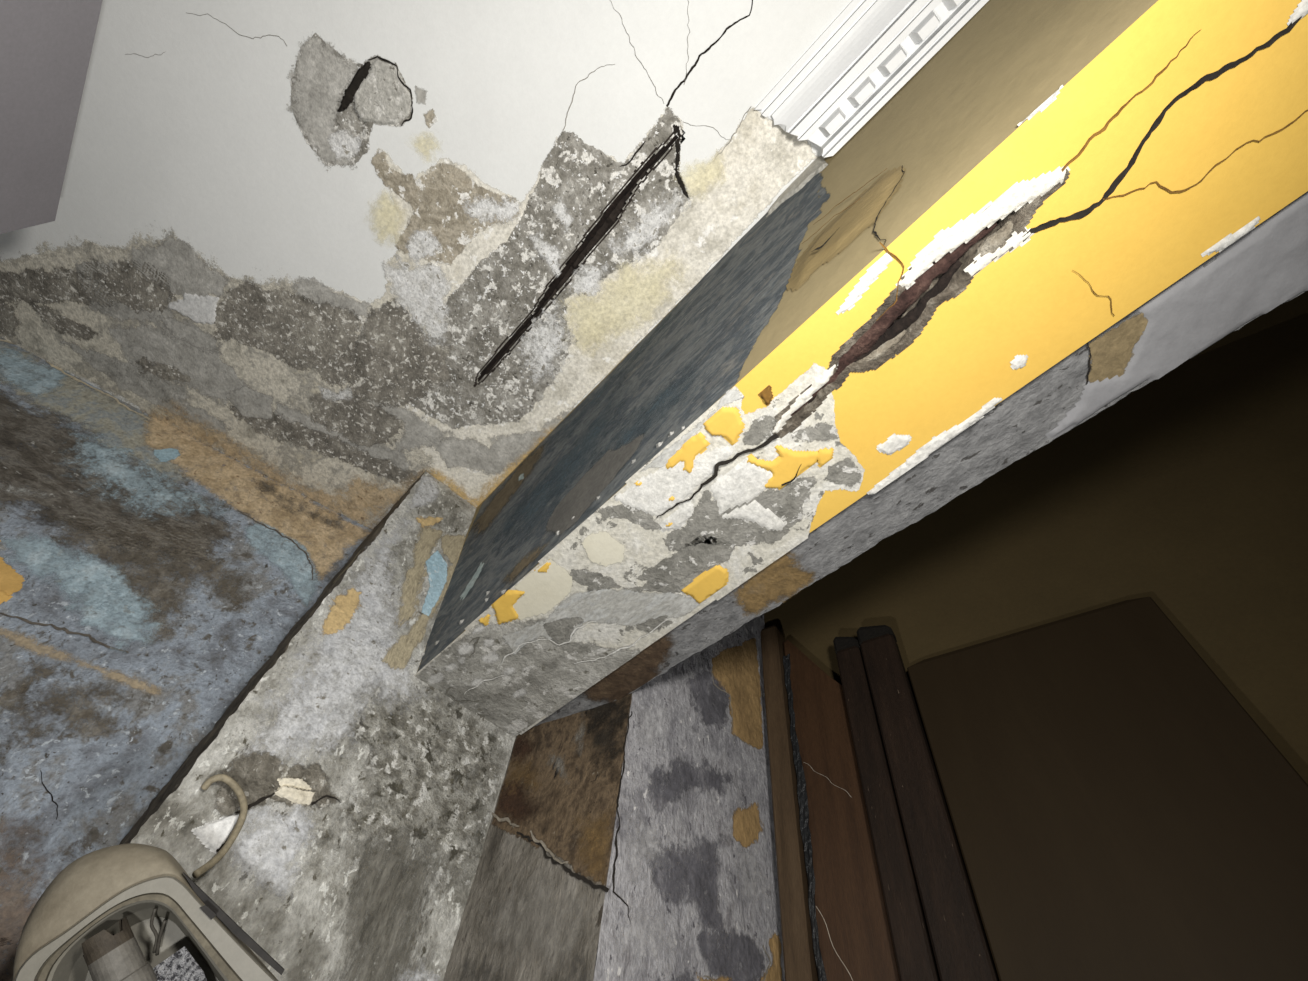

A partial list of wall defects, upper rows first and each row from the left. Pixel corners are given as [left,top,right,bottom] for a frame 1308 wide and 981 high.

crack [563,0,753,178]
crack [1022,0,1308,242]
crack [872,165,905,321]
crack [1072,270,1115,316]
peeling [0,33,1070,749]
water stain [0,390,552,764]
water stain [0,820,46,981]
water stain [234,804,313,896]